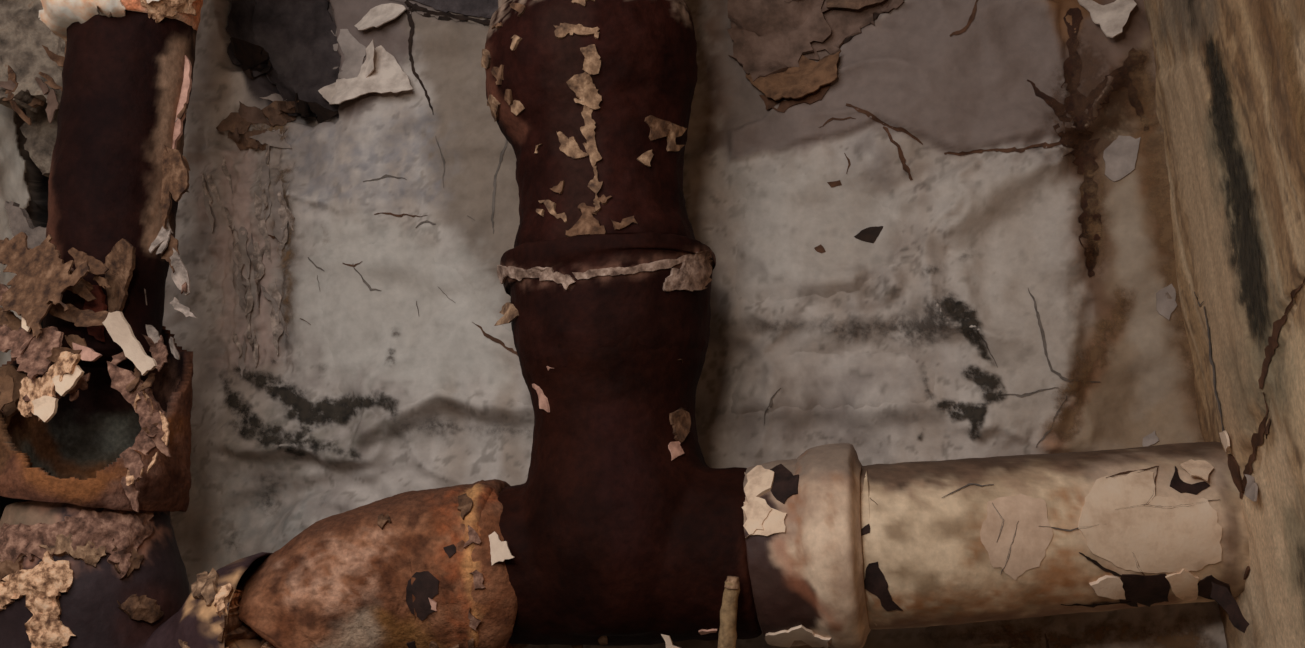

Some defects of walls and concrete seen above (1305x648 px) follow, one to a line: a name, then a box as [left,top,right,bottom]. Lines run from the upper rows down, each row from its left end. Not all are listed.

spalling [0,0,65,177]
spalling [727,0,904,112]
peeling [1078,0,1137,38]
spalling [4,201,46,249]
spalling [202,0,414,381]
damp [1204,35,1269,344]
damp [224,367,396,457]
damp [834,297,1004,439]
crack [942,278,1305,608]